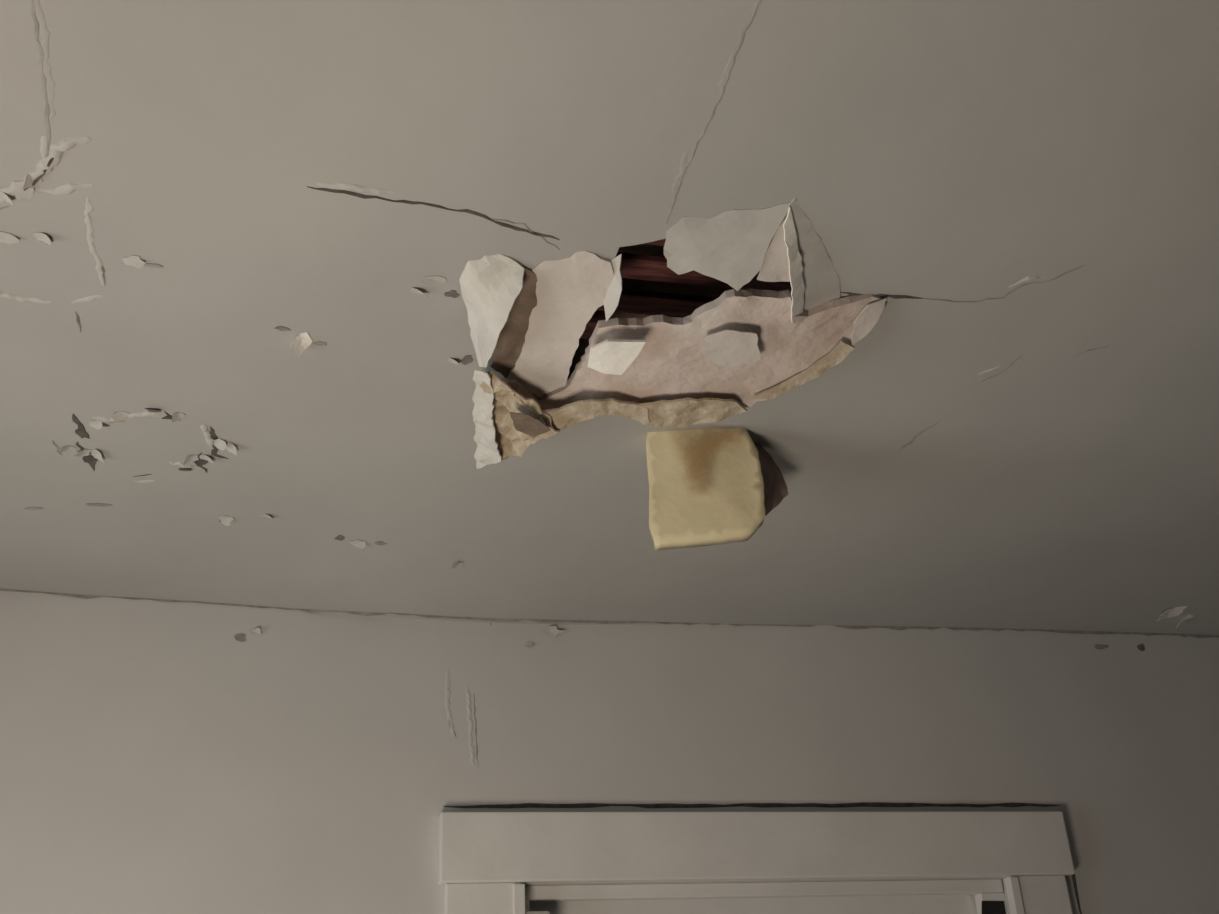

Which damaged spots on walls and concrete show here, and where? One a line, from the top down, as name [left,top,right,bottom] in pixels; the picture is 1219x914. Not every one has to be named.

crack [31,0,56,157]
crack [666,0,763,224]
peeling [0,135,105,332]
crack [307,182,560,249]
spalling [618,244,665,257]
spalling [622,278,743,298]
spalling [567,338,589,380]
peeling [704,330,760,367]
peeling [52,409,186,471]
crack [444,668,478,768]
crack [443,801,1060,809]
crack [1072,874,1082,914]